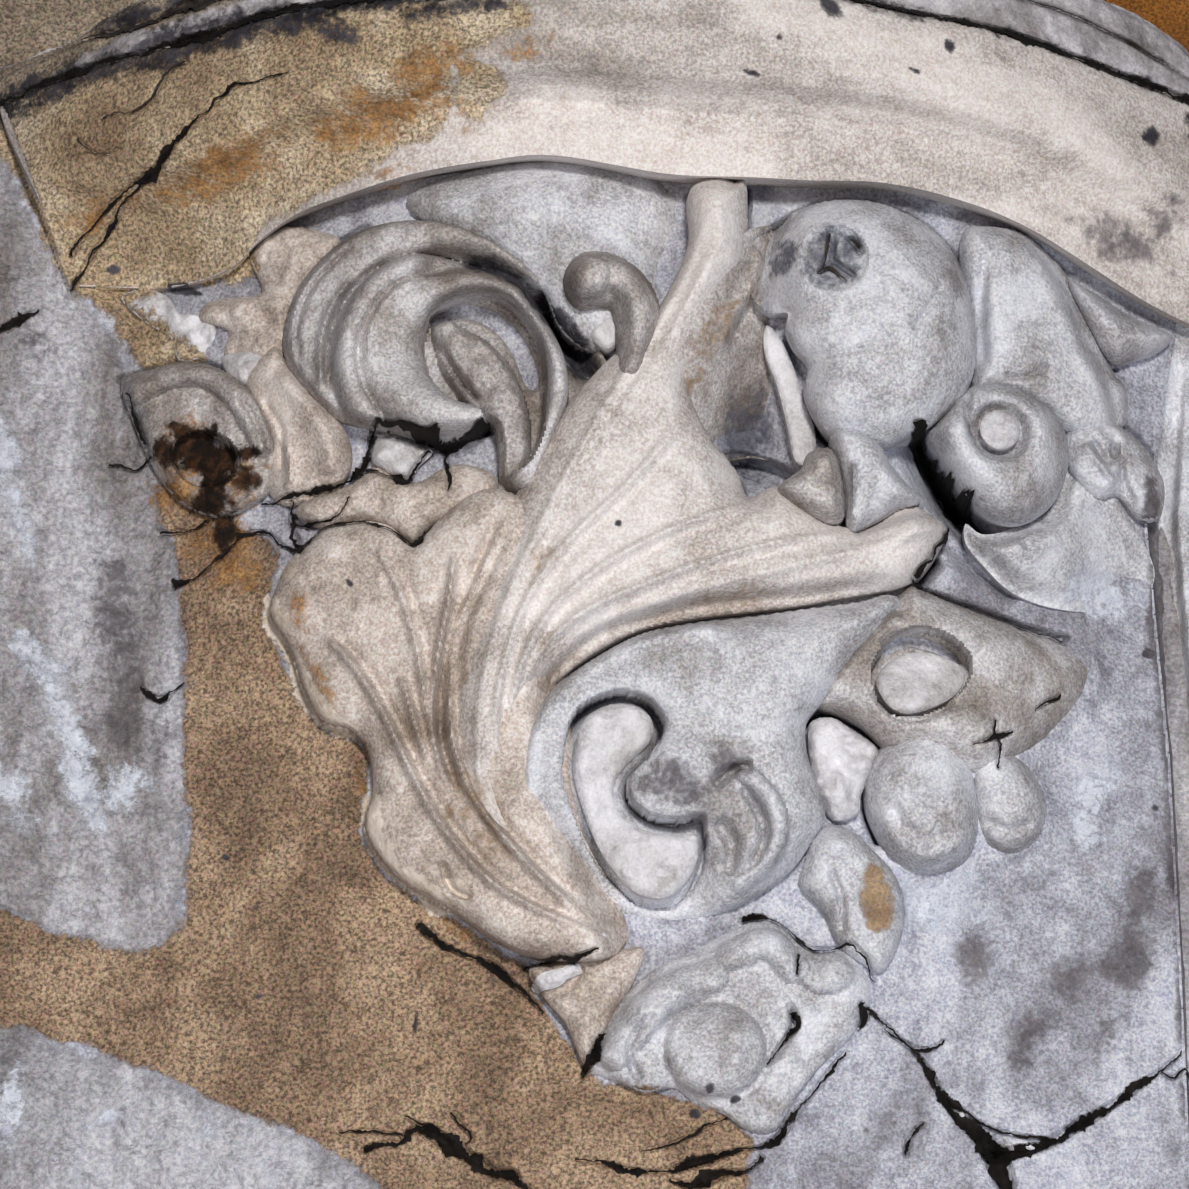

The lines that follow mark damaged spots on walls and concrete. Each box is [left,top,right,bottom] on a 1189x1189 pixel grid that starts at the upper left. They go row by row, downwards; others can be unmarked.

crack [69,71,289,291]
crack [108,393,151,471]
crack [160,520,208,534]
rust [149,415,266,591]
crack [171,417,491,589]
spalling [0,0,754,1189]
crack [416,923,599,1014]
crack [339,1112,528,1189]
crack [581,1033,607,1078]
crack [575,1052,846,1189]
crack [742,913,1189,1189]